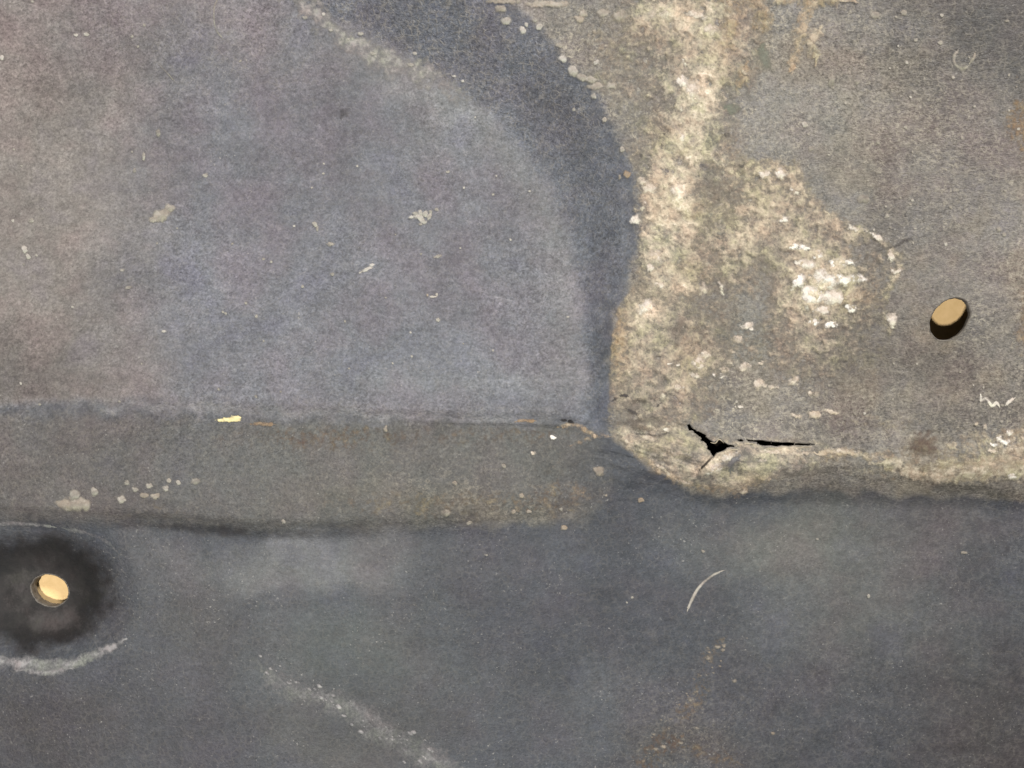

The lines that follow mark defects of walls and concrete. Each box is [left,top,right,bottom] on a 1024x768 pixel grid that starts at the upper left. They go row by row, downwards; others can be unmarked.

water stain [595,0,771,302]
crack [687,424,808,456]
water stain [0,638,127,674]